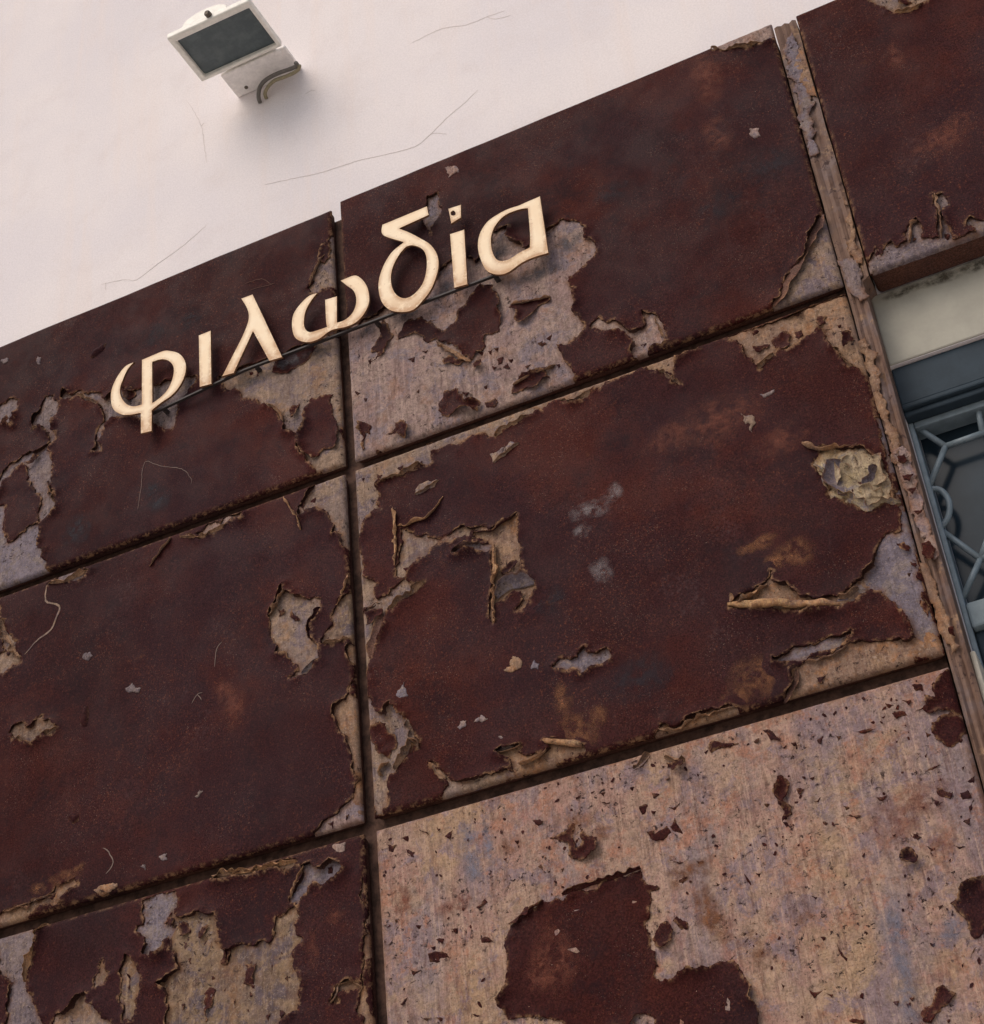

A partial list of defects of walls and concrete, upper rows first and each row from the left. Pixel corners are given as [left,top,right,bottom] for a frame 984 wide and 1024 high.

crack [265,101,467,185]
peeling [0,376,196,591]
peeling [137,220,681,1024]
peeling [330,193,984,1024]
peeling [0,879,140,1024]